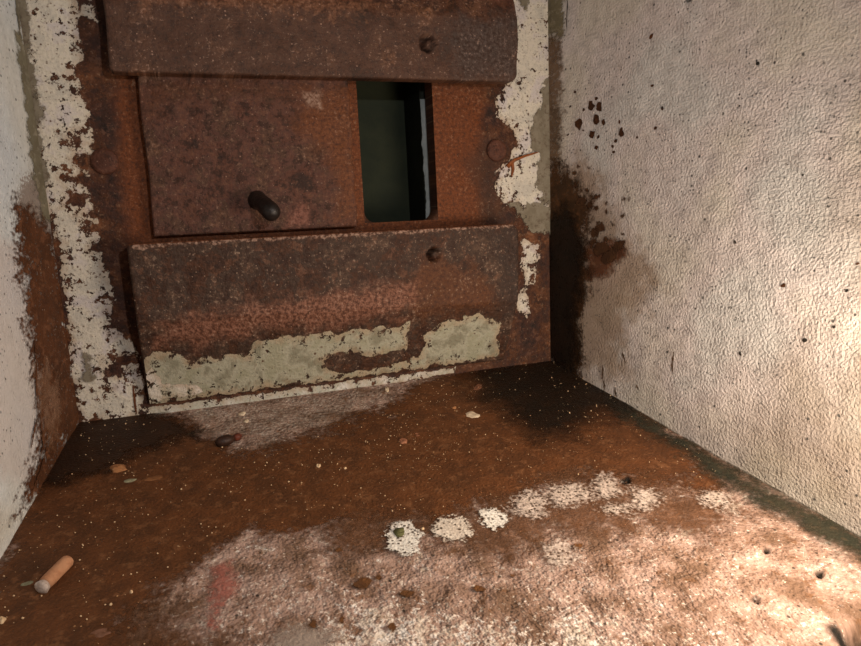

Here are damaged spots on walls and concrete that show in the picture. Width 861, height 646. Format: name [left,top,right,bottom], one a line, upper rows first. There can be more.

peeling [25,0,501,423]
peeling [494,0,549,208]
peeling [517,238,540,318]
corrosion [567,97,605,150]
corrosion [0,158,749,646]
water stain [382,471,667,556]
water stain [543,537,583,570]
water stain [473,361,861,559]